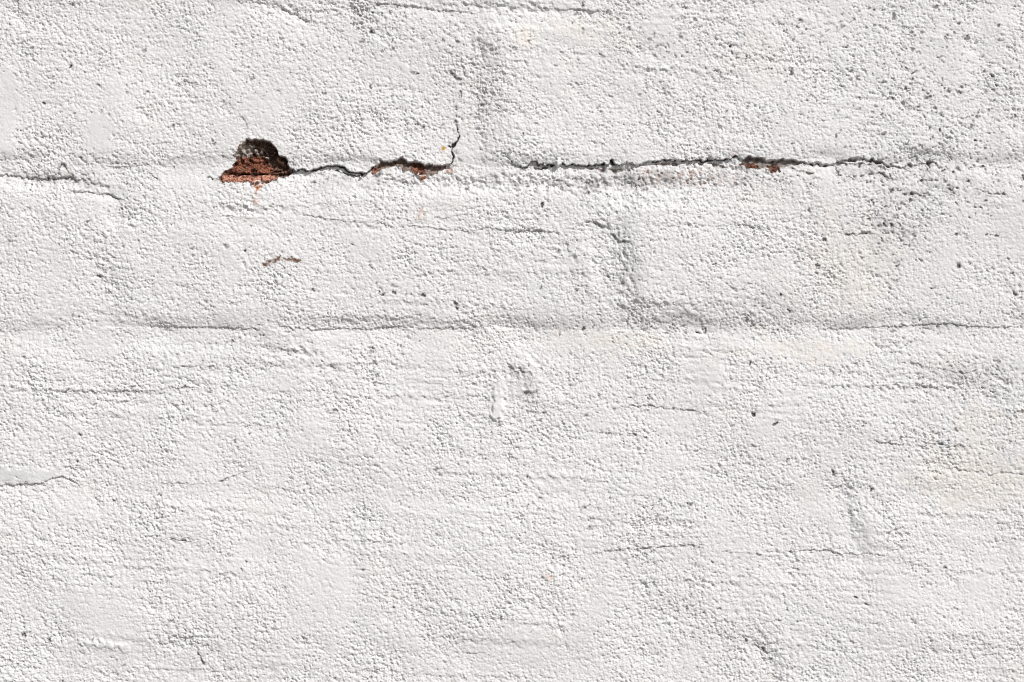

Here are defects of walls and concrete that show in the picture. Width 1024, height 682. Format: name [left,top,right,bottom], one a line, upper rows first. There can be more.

spalling [205,138,295,184]
crack [289,164,377,178]
crack [512,155,742,175]